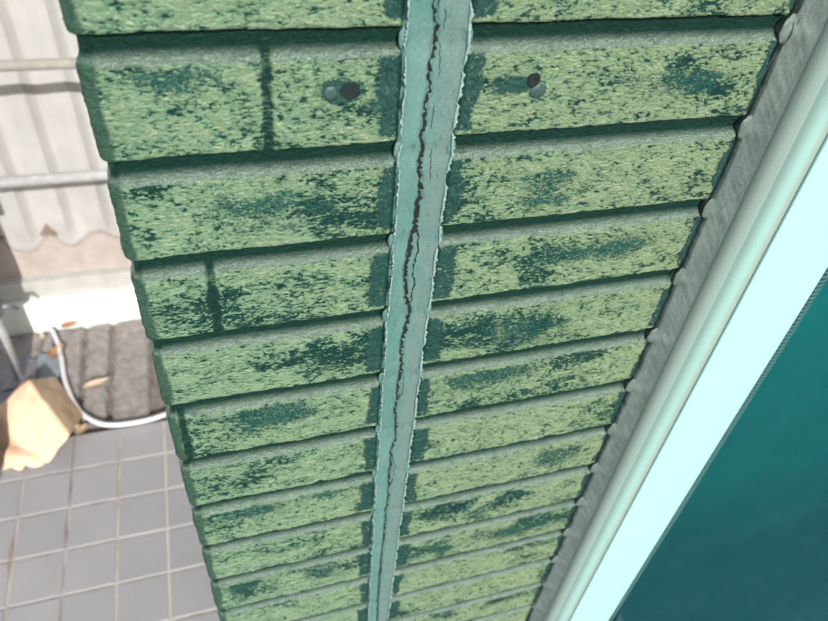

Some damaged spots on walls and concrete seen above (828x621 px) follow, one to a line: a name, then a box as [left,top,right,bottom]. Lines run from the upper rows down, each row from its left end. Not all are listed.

crack [376,0,446,621]